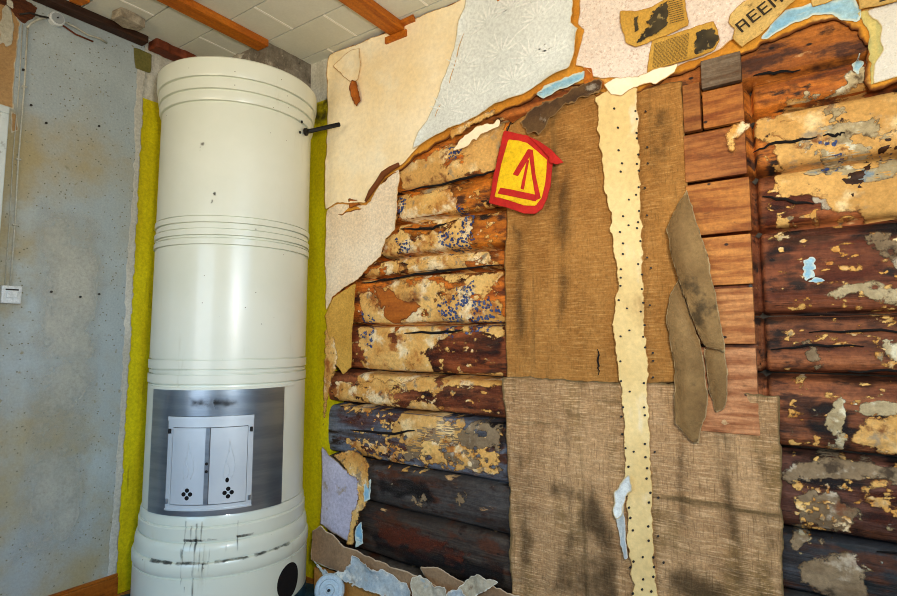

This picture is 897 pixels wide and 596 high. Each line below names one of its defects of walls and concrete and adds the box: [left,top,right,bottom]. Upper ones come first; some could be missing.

peeling [725,53,897,269]
peeling [803,257,825,283]
peeling [827,280,897,306]
peeling [331,117,510,547]
peeling [801,339,824,371]
peeling [874,339,897,367]
peeling [782,397,897,596]
damp [586,497,607,547]
damp [592,560,615,596]
damp [673,574,722,596]